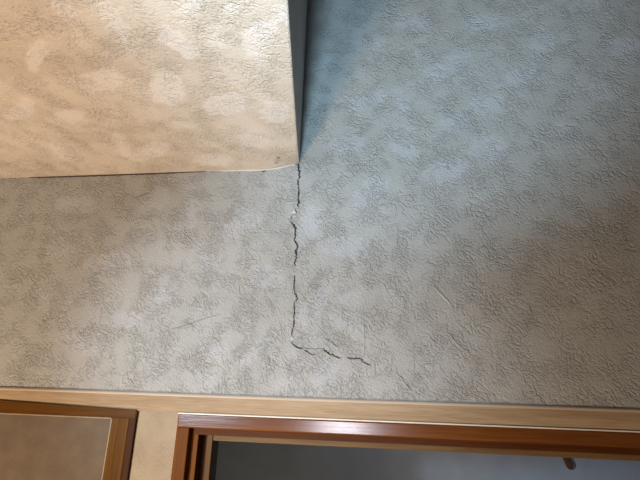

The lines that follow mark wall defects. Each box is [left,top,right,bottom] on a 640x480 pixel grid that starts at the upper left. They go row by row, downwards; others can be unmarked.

crack [290,162,372,367]